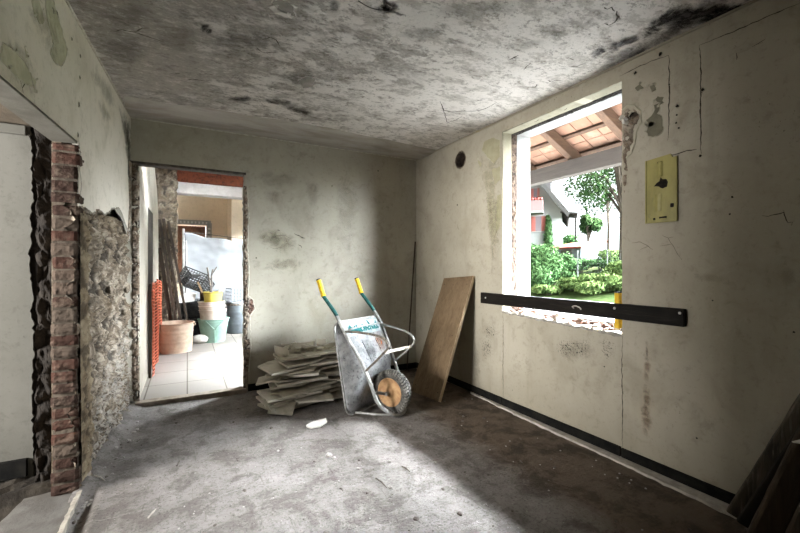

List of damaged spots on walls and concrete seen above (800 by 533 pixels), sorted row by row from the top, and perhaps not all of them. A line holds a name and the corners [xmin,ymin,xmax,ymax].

peeling [31,0,73,67]
damp [592,36,644,67]
damp [646,5,741,39]
damp [266,99,308,114]
flaking render [619,71,664,193]
flaking render [496,89,622,295]
spalling [33,129,52,483]
flaking render [63,161,141,487]
flaking render [502,307,622,337]